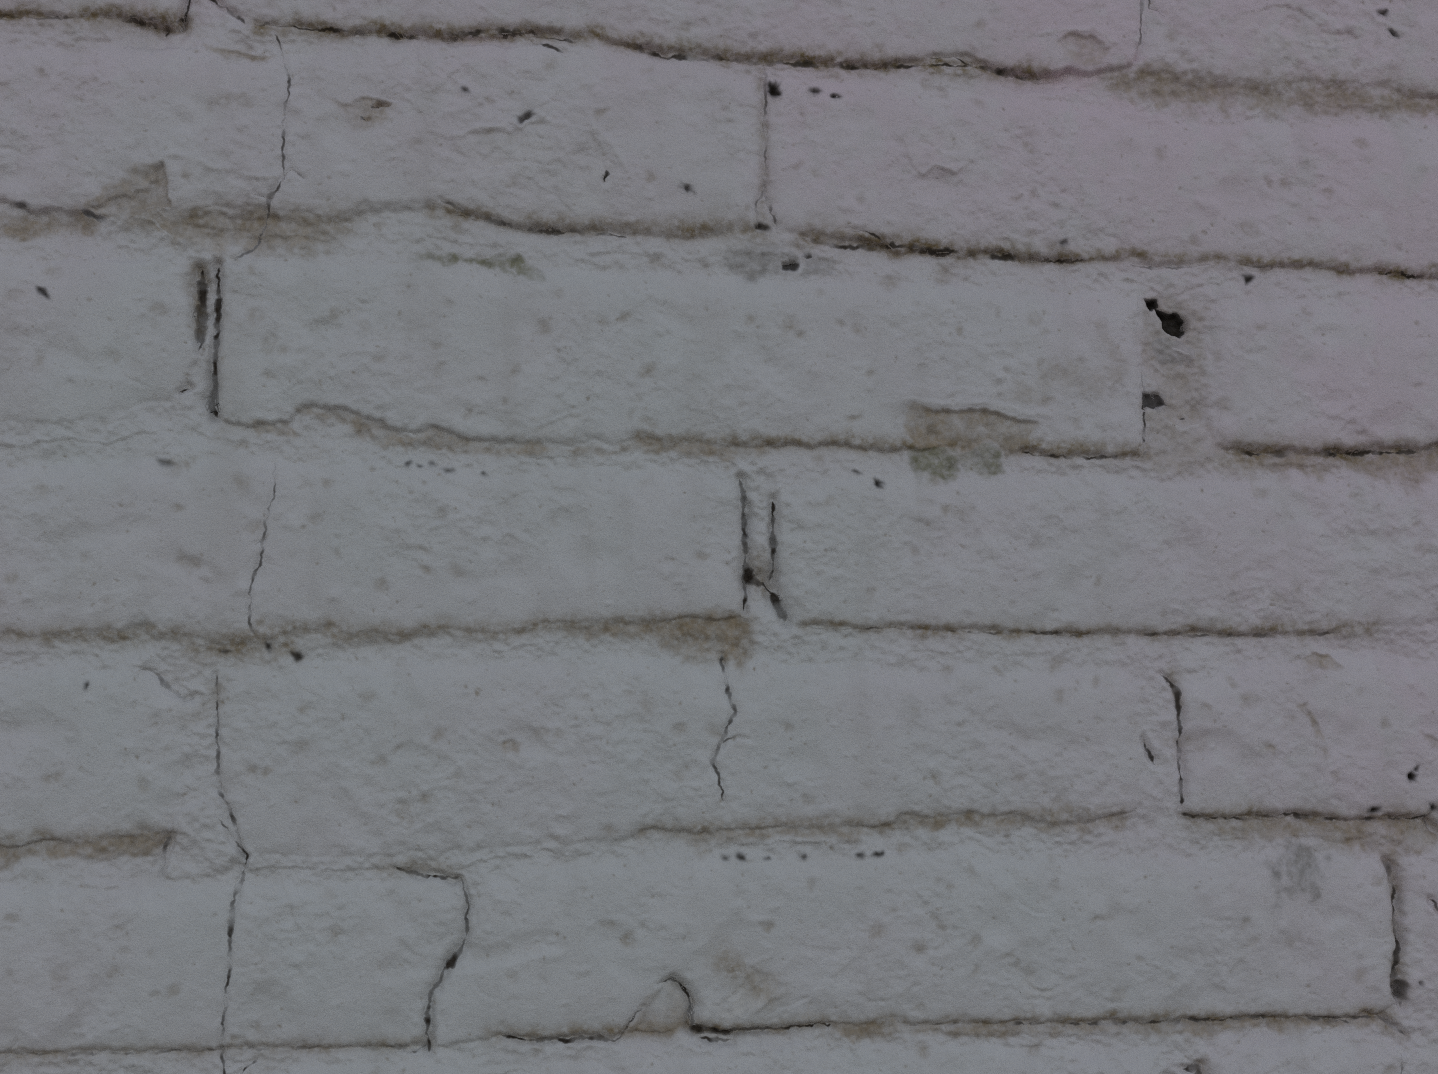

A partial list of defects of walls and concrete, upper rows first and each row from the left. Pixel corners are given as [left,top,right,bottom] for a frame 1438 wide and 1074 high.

spalling [1133,290,1241,483]
crack [710,655,750,800]
crack [1143,674,1184,805]
crack [161,834,172,873]
crack [214,674,258,1074]
crack [394,866,470,1053]
spalling [614,949,786,1043]
crack [1376,861,1406,1074]
crack [1183,1064,1202,1074]